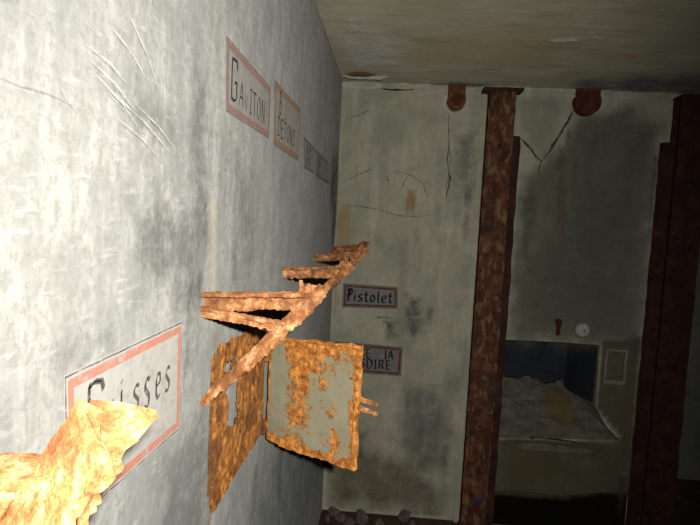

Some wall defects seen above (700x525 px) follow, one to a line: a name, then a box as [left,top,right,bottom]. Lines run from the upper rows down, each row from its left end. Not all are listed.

crack [352,114,451,217]
crack [521,110,574,174]